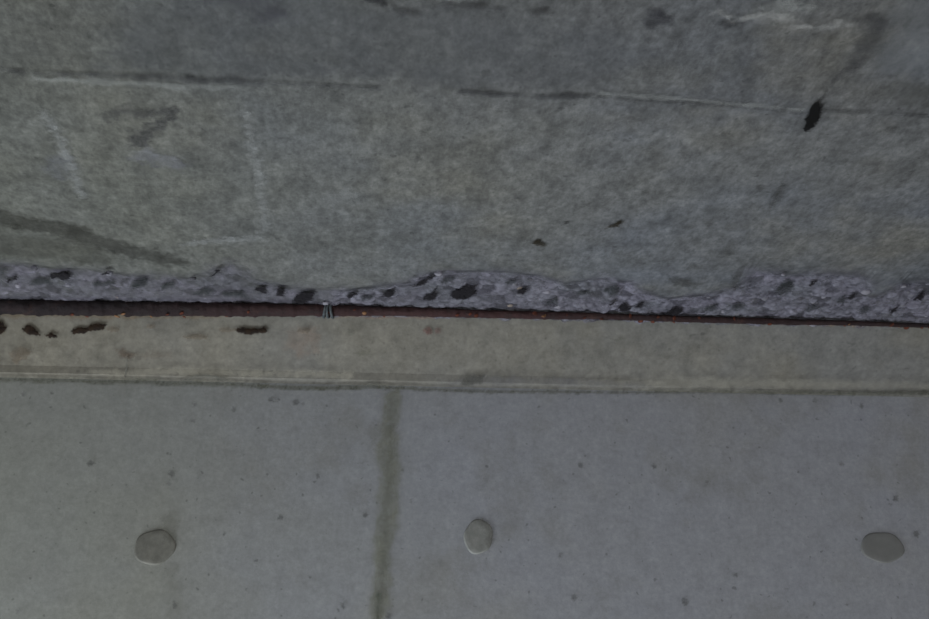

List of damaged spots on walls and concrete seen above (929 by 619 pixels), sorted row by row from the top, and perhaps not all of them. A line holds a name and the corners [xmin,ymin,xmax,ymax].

spalling [0,266,929,328]
corrosion [22,325,57,338]
corrosion [71,316,107,334]
corrosion [236,327,267,335]